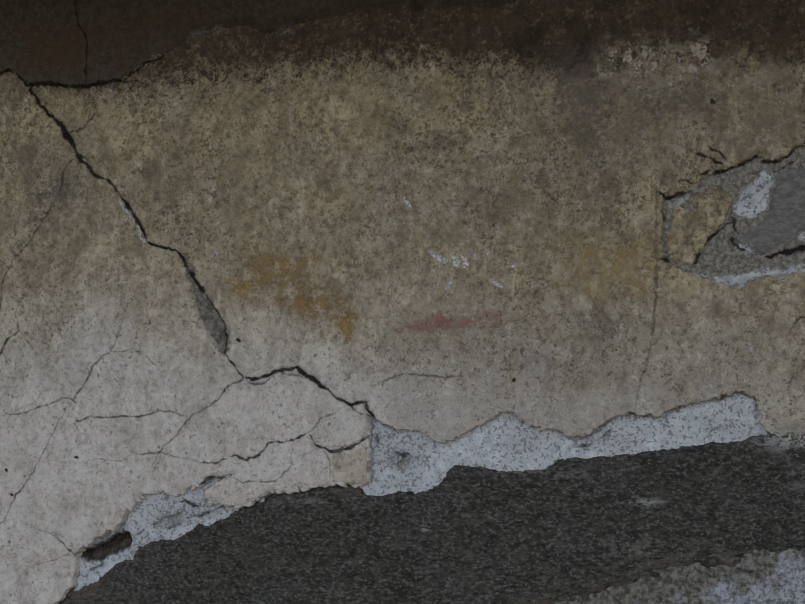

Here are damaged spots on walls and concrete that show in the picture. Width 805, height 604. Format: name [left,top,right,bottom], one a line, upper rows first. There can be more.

water stain [110,0,805,147]
crack [0,12,374,418]
spalling [661,143,805,287]
spalling [74,458,279,591]
crack [201,434,366,484]
spalling [311,392,767,496]
spalling [555,547,805,604]